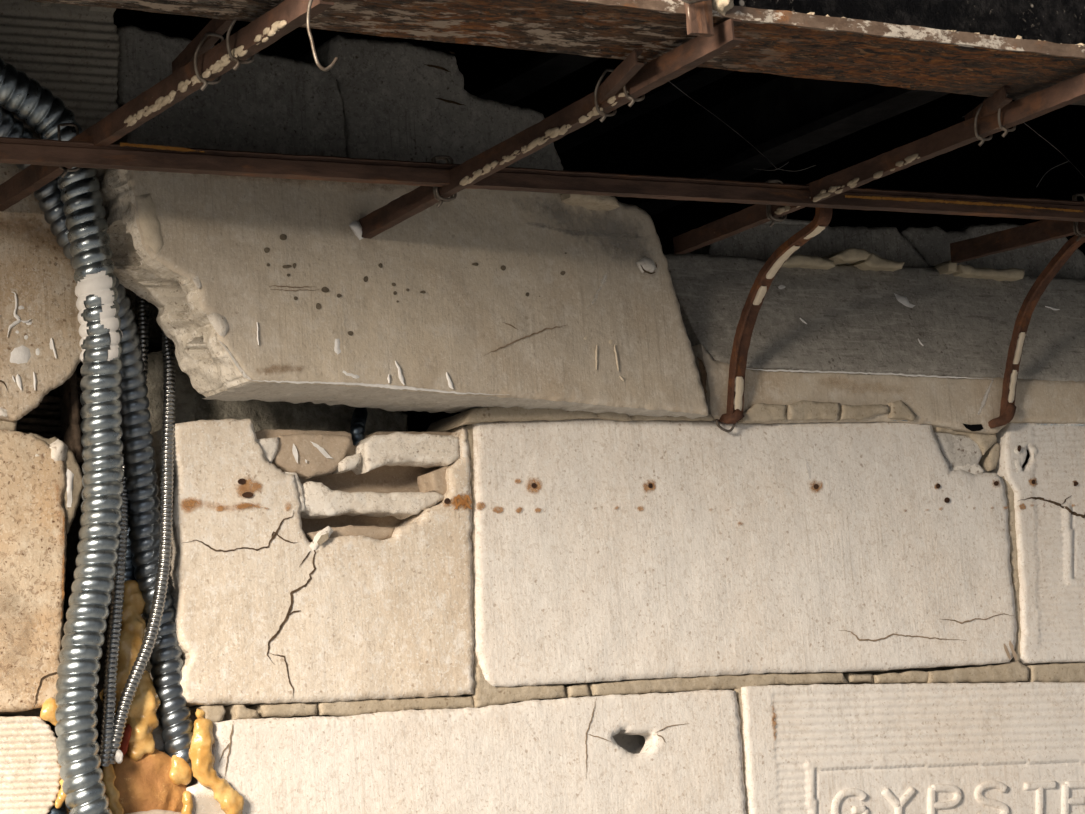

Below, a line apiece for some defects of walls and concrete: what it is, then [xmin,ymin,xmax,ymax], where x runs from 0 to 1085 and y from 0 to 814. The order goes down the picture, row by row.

rust [120,142,205,153]
rust [845,195,1084,212]
spalling [255,429,460,551]
rust [182,499,201,511]
crack [1021,495,1085,518]
crack [181,511,316,693]
crack [839,613,1015,641]
crack [585,698,611,779]